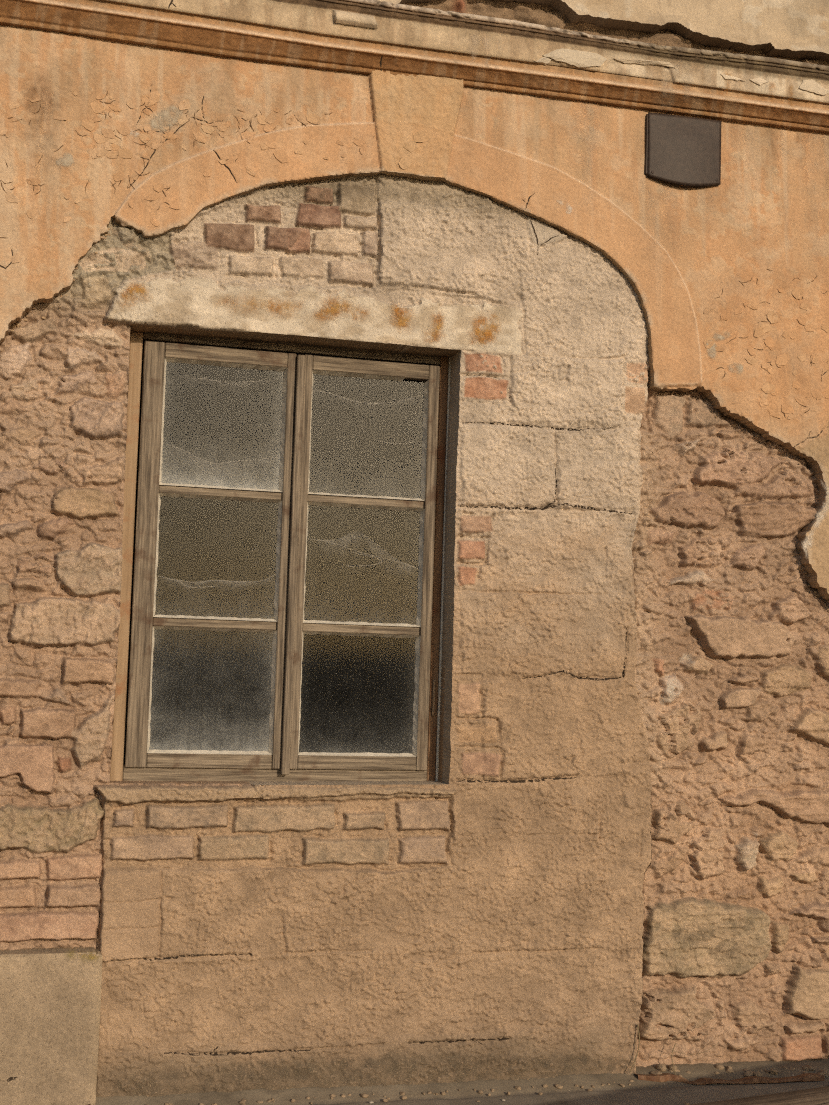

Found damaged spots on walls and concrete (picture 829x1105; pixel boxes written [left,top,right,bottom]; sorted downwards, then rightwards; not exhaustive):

spalling [404,0,829,68]
spalling [0,174,457,951]
spalling [632,389,829,1067]